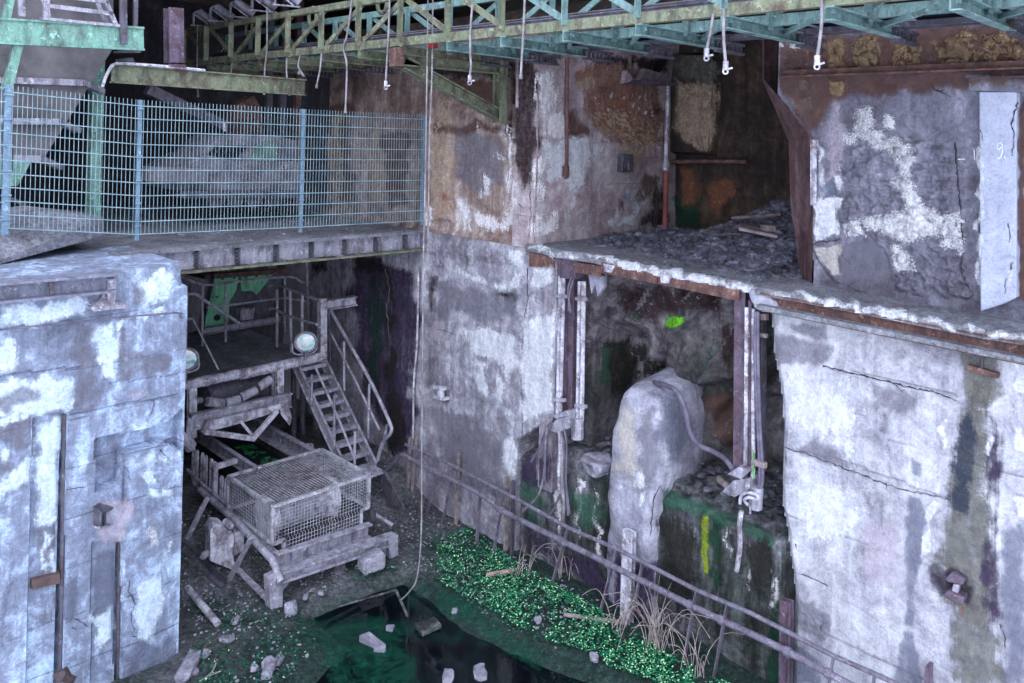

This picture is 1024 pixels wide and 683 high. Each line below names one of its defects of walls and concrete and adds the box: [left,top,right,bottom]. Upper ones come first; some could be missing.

damp [455,69,756,293]
corrosion [575,61,665,147]
corrosion [680,166,736,214]
corrosion [779,24,1024,138]
crack [954,142,974,301]
crack [1010,103,1018,156]
damp [0,297,172,426]
damp [346,250,555,498]
peeling [775,324,832,365]
crack [813,365,957,401]
crack [785,447,949,500]
damp [921,352,1024,683]